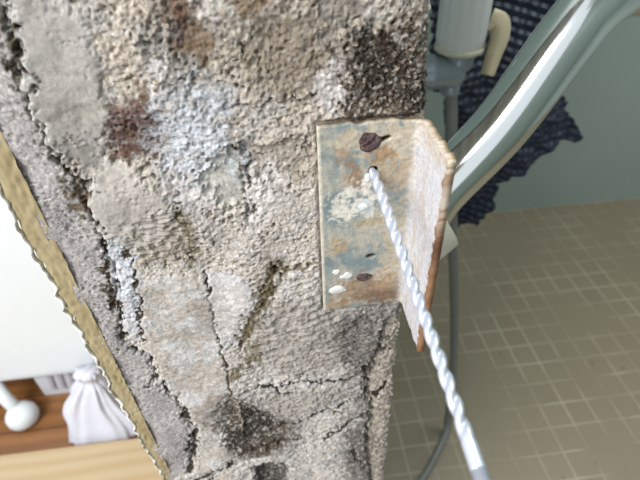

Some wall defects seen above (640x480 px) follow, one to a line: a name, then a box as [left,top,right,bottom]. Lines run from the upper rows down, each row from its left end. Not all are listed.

leakage [312,8,429,120]
rust [102,82,162,165]
spalling [128,211,189,268]
crack [3,0,391,480]
leakage [195,430,233,452]